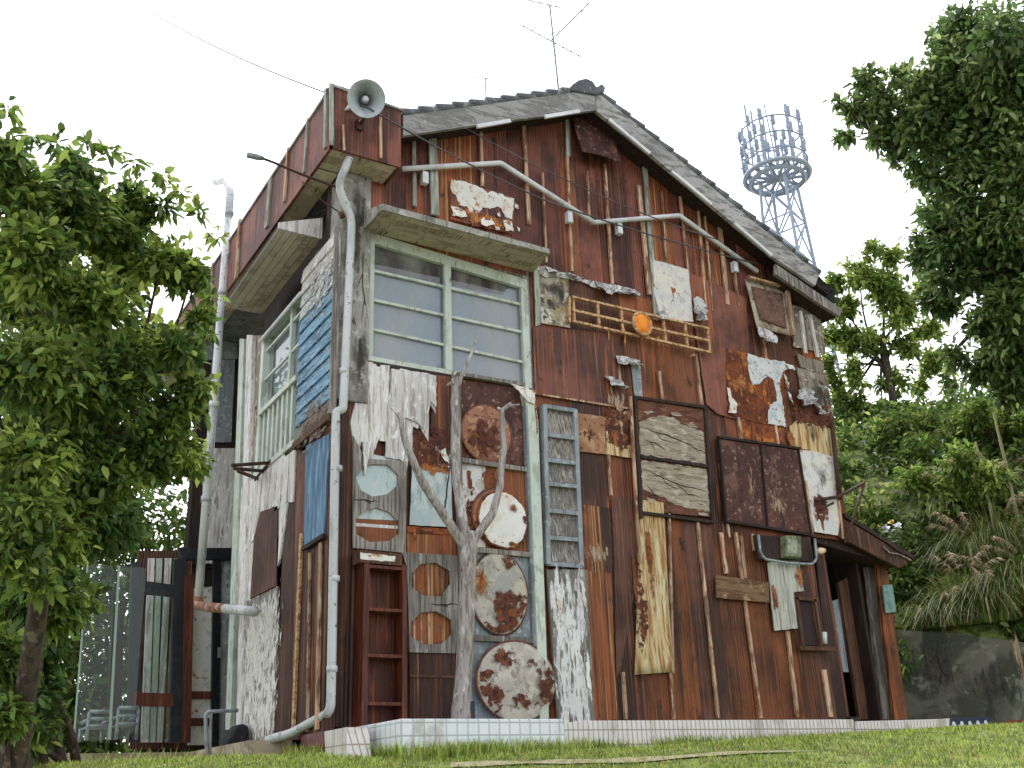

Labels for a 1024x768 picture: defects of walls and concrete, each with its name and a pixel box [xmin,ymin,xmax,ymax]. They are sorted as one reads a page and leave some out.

peeling [450,180,520,232]
rust [371,121,847,721]
peeling [727,388,737,413]
peeling [747,353,795,427]
crack [641,426,708,501]
peeling [243,586,283,741]
peeling [550,563,592,724]